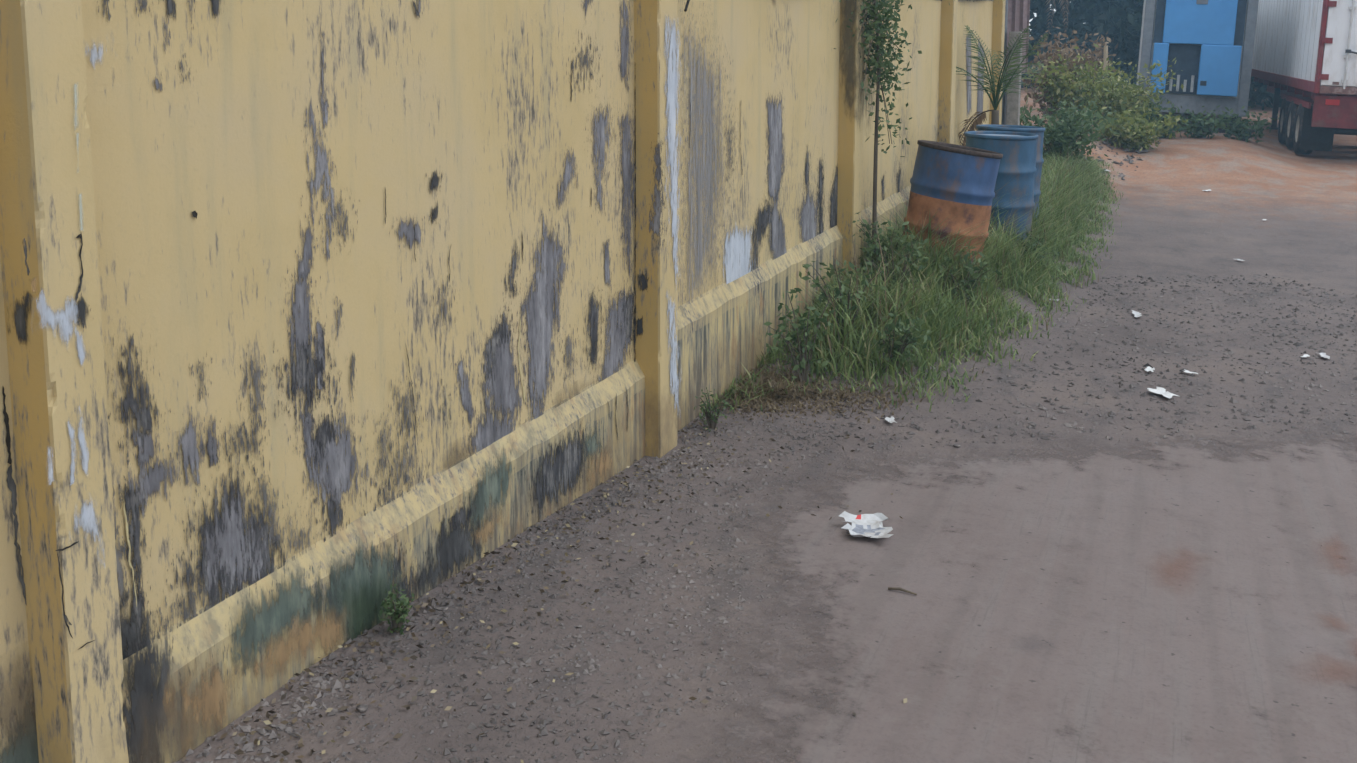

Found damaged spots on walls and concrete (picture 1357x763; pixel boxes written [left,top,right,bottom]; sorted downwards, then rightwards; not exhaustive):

water stain [751,89,838,270]
peeling [108,0,753,541]
water stain [638,271,649,291]
crack [2,387,28,618]
crack [56,541,95,649]
peeling [68,408,89,484]
peeling [75,502,100,541]
water stain [112,448,325,763]
water stain [322,518,489,645]